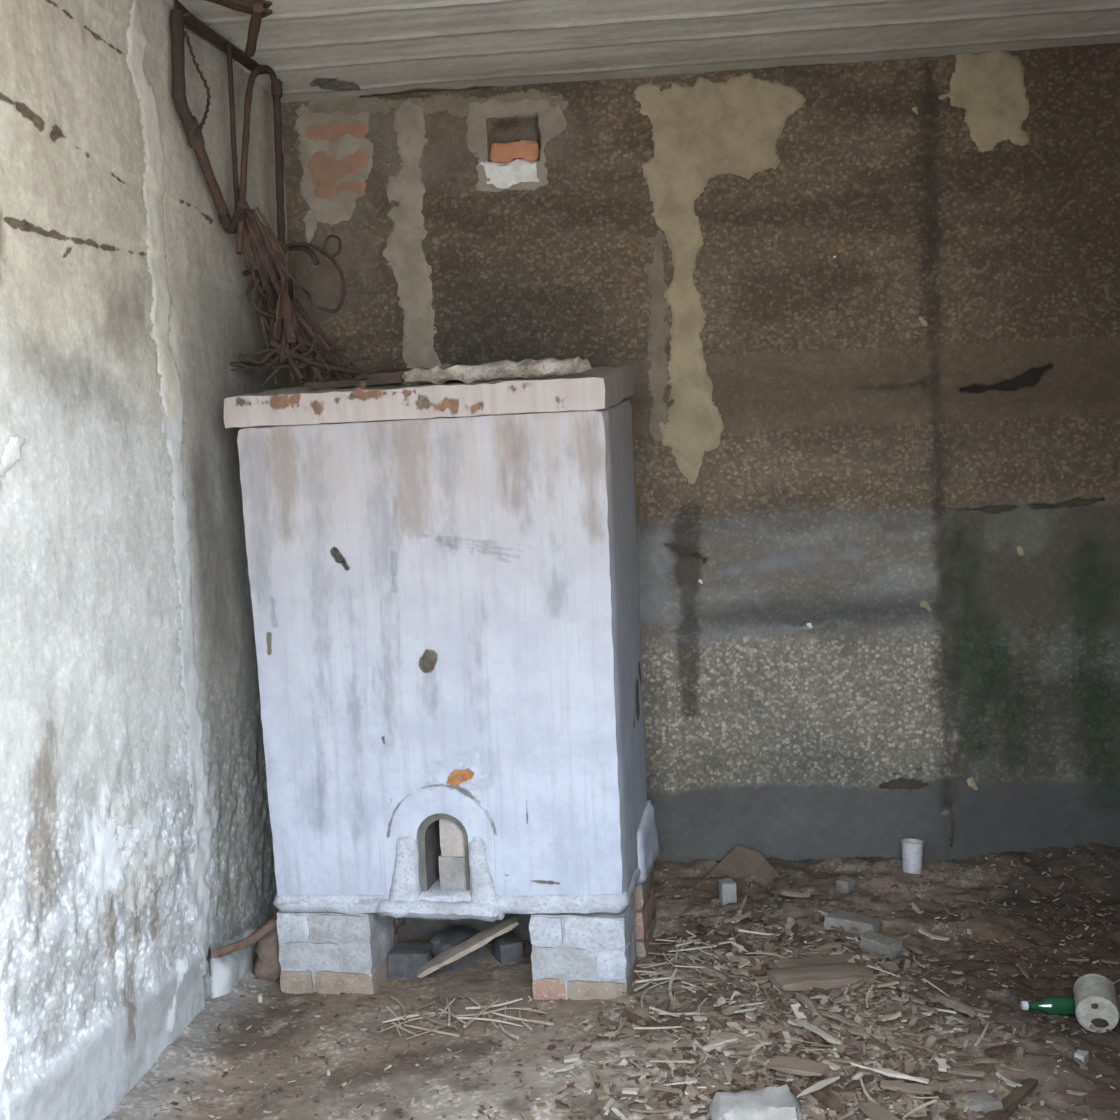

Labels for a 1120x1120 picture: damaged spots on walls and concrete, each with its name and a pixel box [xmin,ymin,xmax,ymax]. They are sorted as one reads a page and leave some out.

crack [0,92,90,158]
crack [4,217,166,258]
crack [180,200,213,224]
flaking render [293,104,375,249]
peeling [466,94,567,194]
peeling [0,435,26,490]
crack [965,497,1105,514]
leakage [77,774,176,936]
leakage [167,954,189,1033]
leakage [0,1001,11,1120]